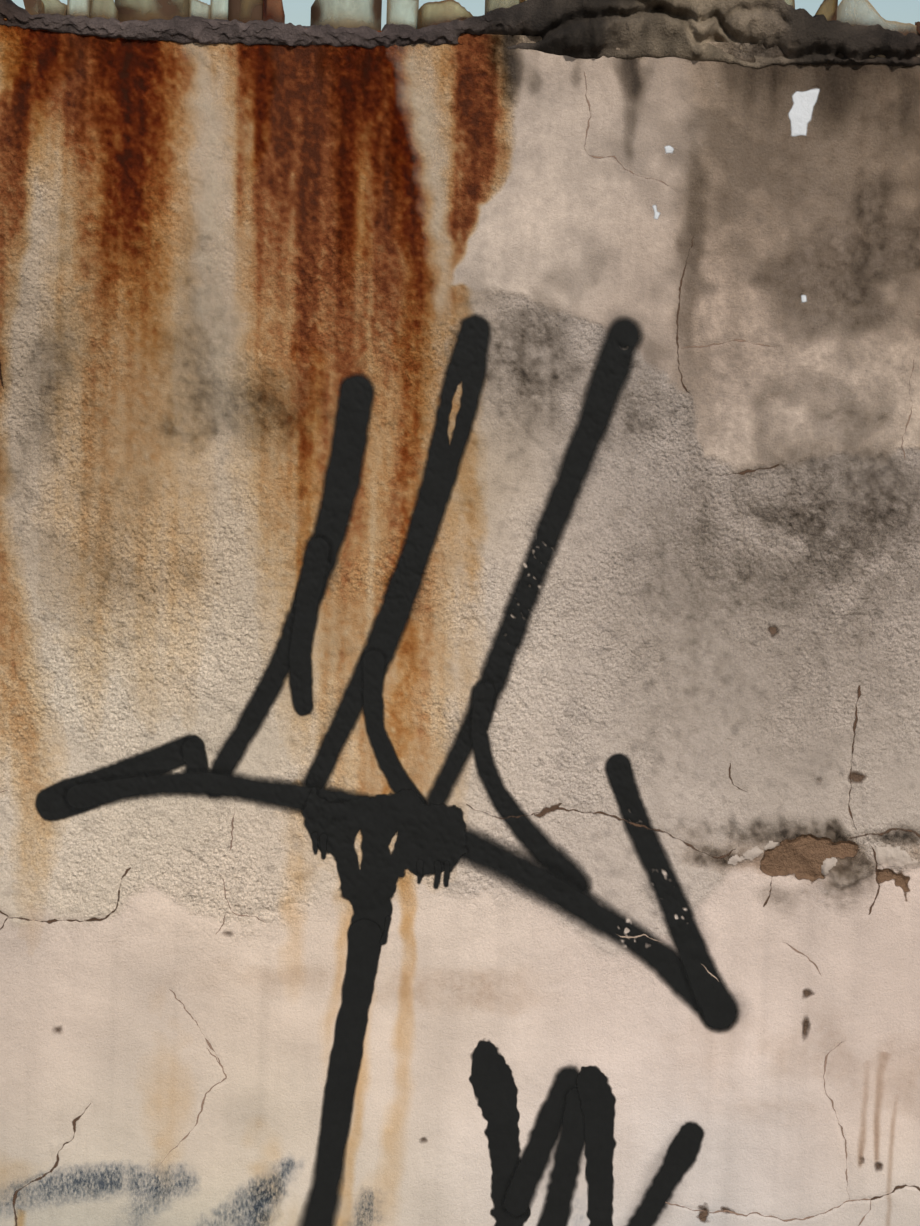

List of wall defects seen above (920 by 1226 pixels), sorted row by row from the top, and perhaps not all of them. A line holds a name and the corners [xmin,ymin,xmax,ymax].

rust [0,29,174,230]
rust [238,31,424,385]
rust [451,34,497,237]
crack [0,867,131,929]
crack [467,803,735,858]
crack [617,934,661,942]
peeling [728,834,859,883]
crack [848,685,920,915]
peeling [874,844,918,901]
crack [13,1103,91,1226]
crack [169,989,227,1150]
crack [665,1042,920,1225]